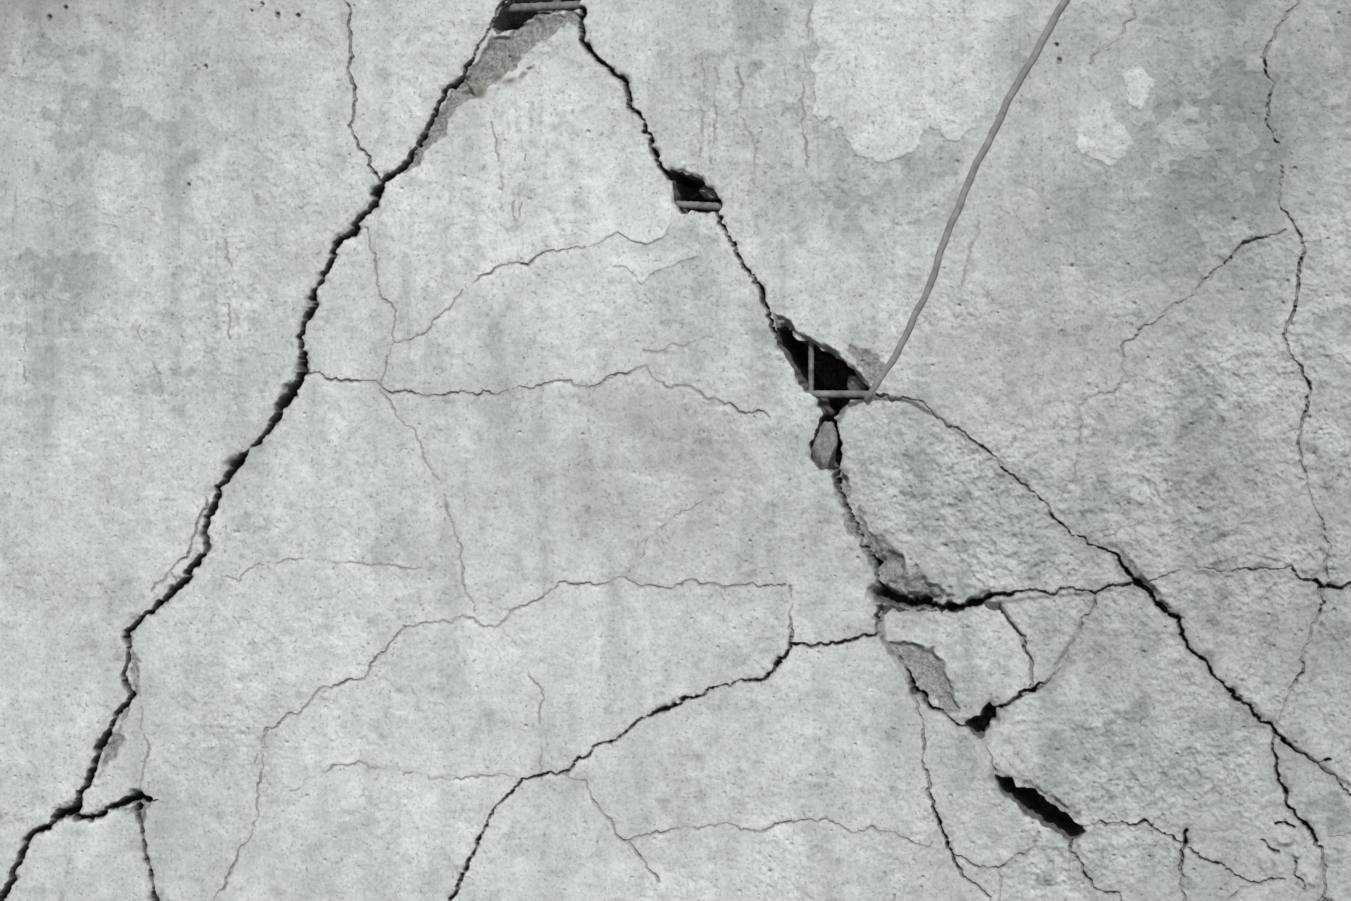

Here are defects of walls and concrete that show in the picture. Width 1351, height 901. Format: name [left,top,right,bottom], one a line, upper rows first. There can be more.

flaking render [581,120,701,285]
spalling [771,311,887,395]
crack [0,0,792,901]
crack [448,0,1351,901]
spalling [884,638,965,715]
spalling [1011,773,1087,826]